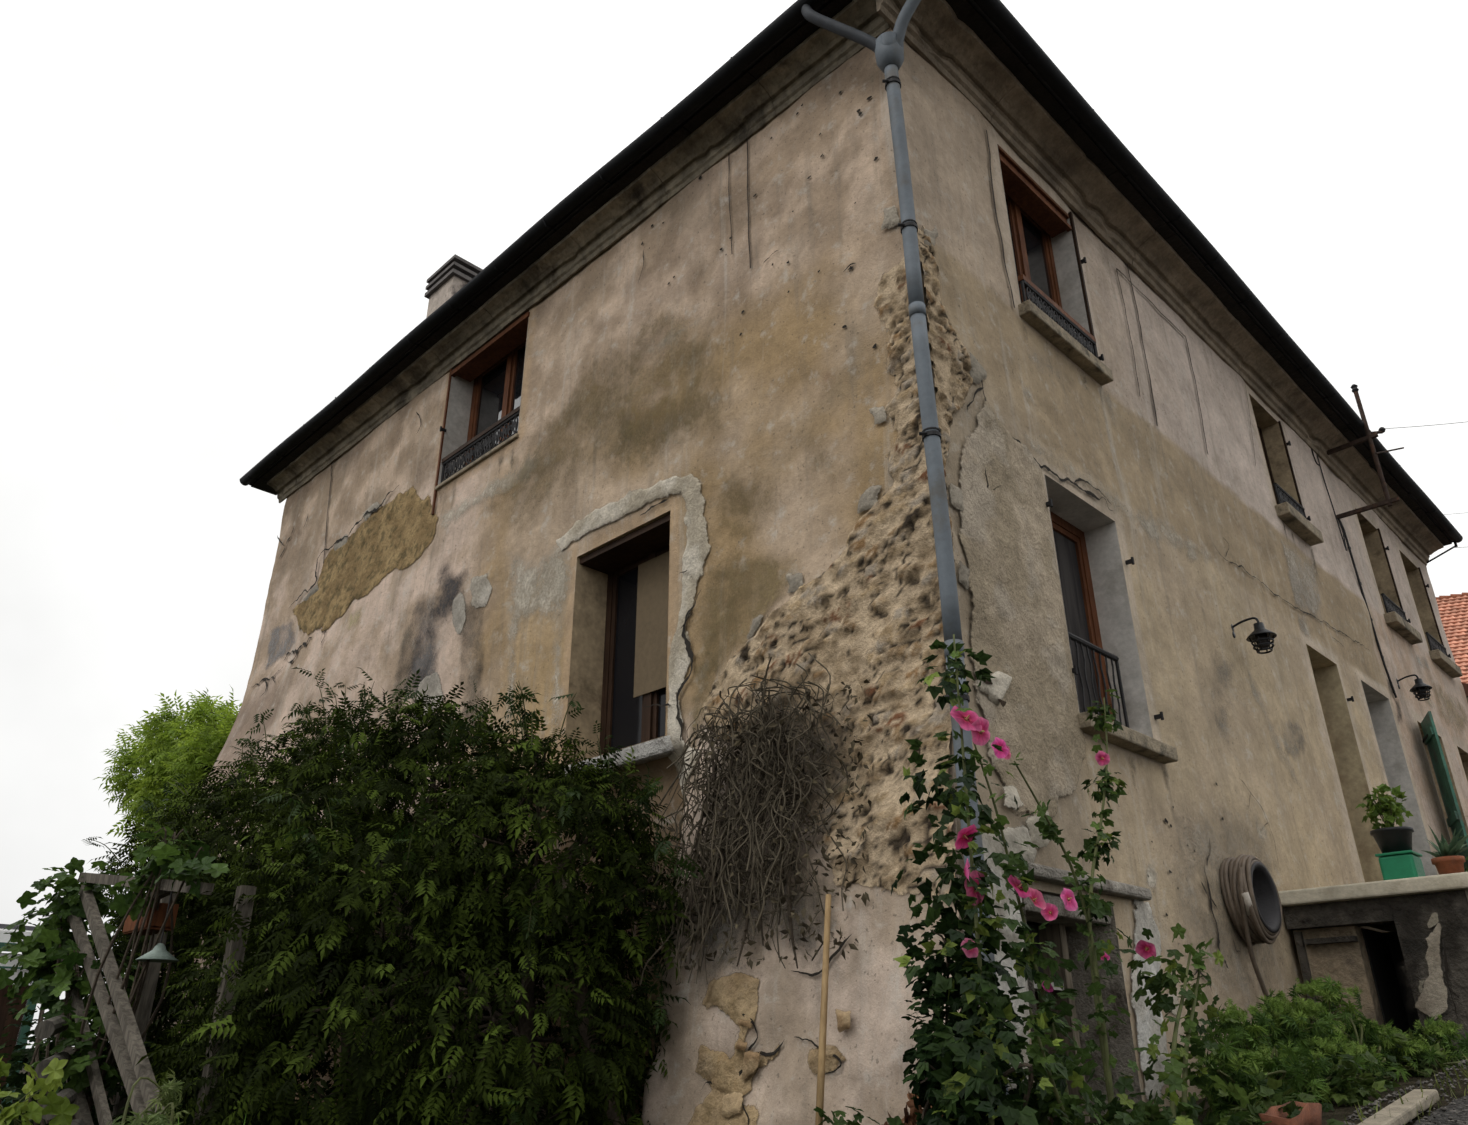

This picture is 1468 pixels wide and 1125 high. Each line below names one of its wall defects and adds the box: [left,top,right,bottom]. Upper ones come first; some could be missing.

crack [967,380,986,410]
crack [1014,438,1113,511]
peeling [291,485,438,635]
damp [395,567,483,726]
peeling [556,474,711,795]
spalling [702,226,1085,1089]
spalling [688,972,779,1125]